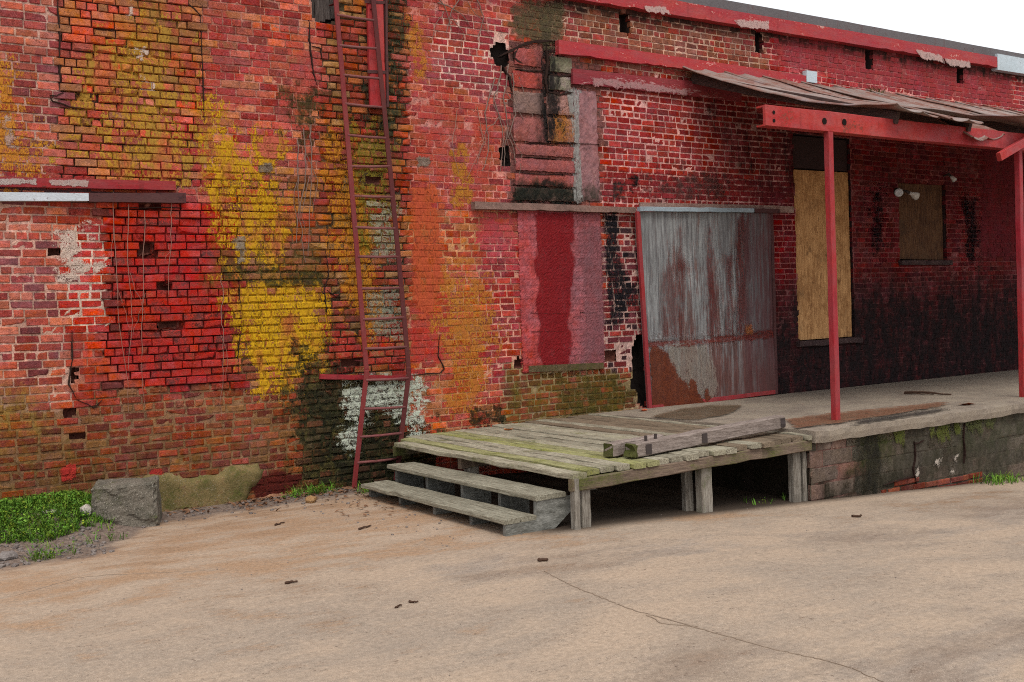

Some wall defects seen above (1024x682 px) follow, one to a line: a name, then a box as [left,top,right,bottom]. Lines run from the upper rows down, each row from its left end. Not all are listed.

spalling [490,42,509,67]
peeling [590,76,688,95]
peeling [916,49,971,68]
peeling [57,253,109,283]
water stain [0,0,510,489]
water stain [505,18,640,418]
rust [648,218,773,406]
crack [544,571,884,682]